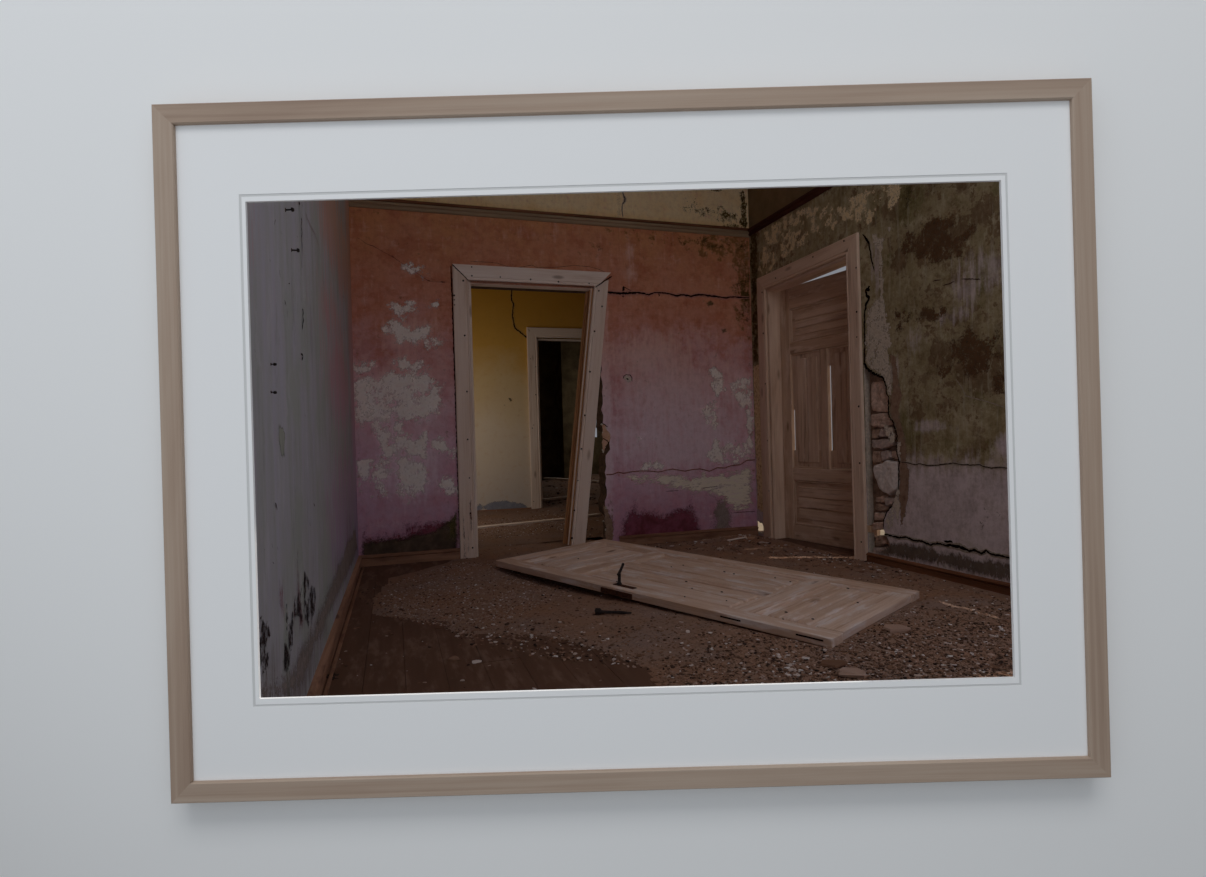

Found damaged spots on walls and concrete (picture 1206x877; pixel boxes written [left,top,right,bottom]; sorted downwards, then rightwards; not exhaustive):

damp [900,214,976,263]
peeling [353,298,449,425]
crack [358,238,754,535]
peeling [618,365,763,512]
flaking render [758,184,910,553]
damp [889,307,947,332]
damp [936,325,1005,394]
damp [262,501,527,698]
damp [622,503,700,536]
crack [884,533,1010,560]